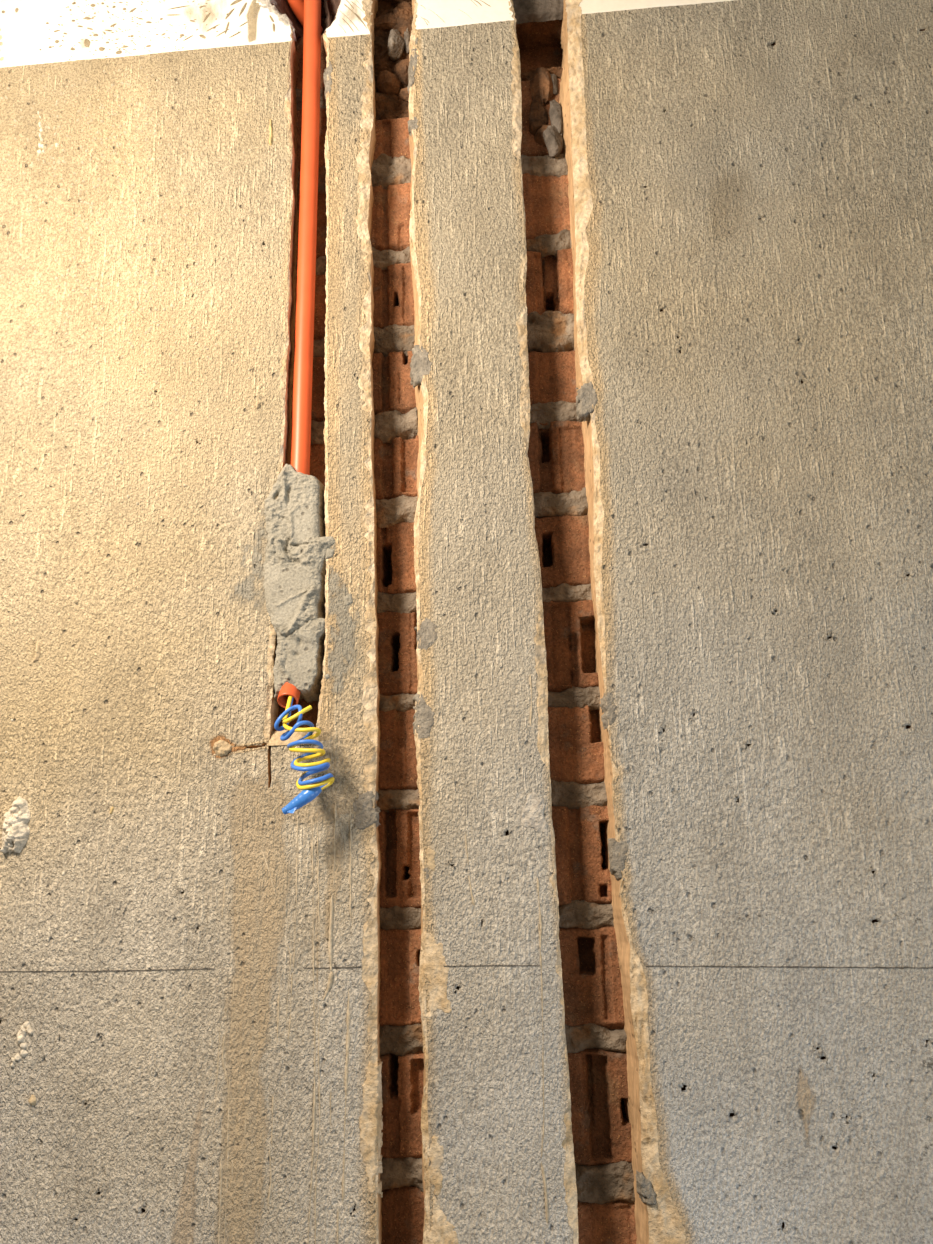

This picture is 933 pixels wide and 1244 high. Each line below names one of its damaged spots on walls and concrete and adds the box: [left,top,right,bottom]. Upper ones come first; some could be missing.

crack [214,739,271,788]